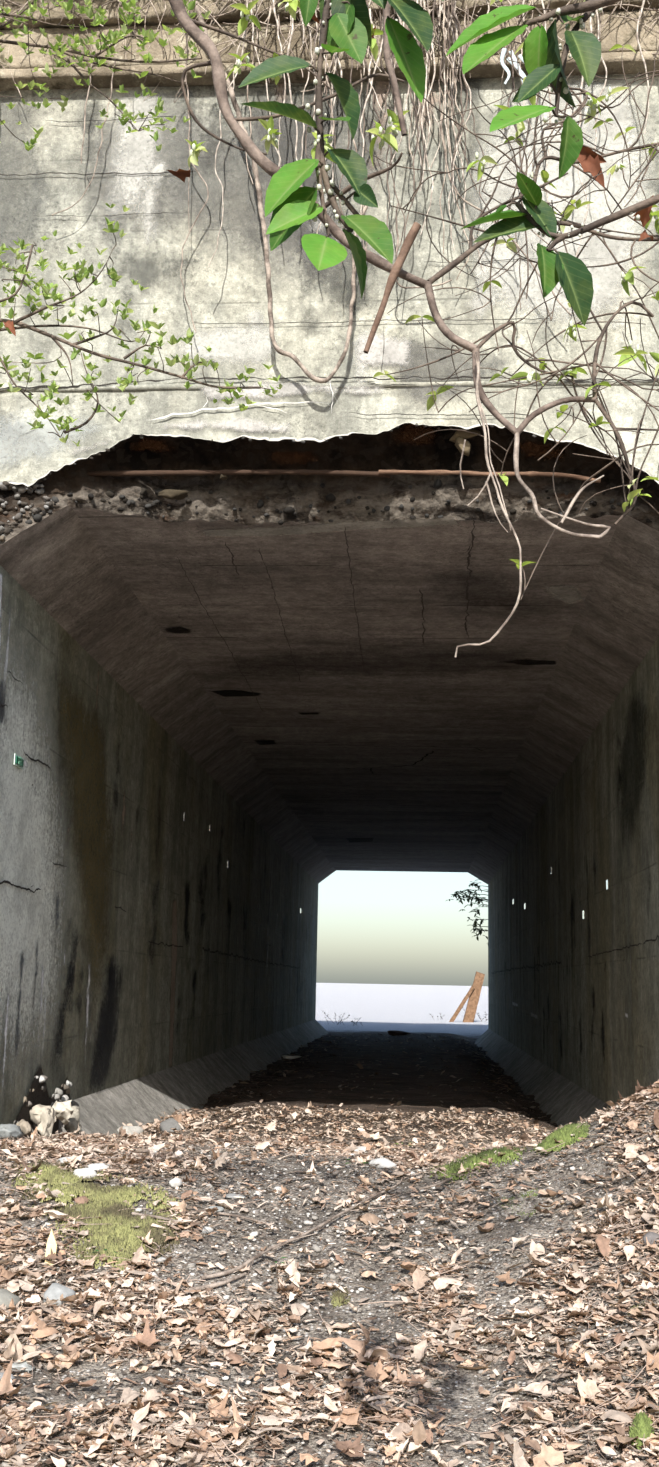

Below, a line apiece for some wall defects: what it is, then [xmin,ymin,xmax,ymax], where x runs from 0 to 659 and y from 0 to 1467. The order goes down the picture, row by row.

damp [86,103,98,130]
damp [117,98,163,229]
damp [250,91,373,304]
damp [183,312,272,361]
peeling [203,382,380,399]
spalling [0,418,659,546]
crack [464,516,475,638]
crack [0,861,69,893]
damp [0,574,123,1092]
crack [491,935,659,974]